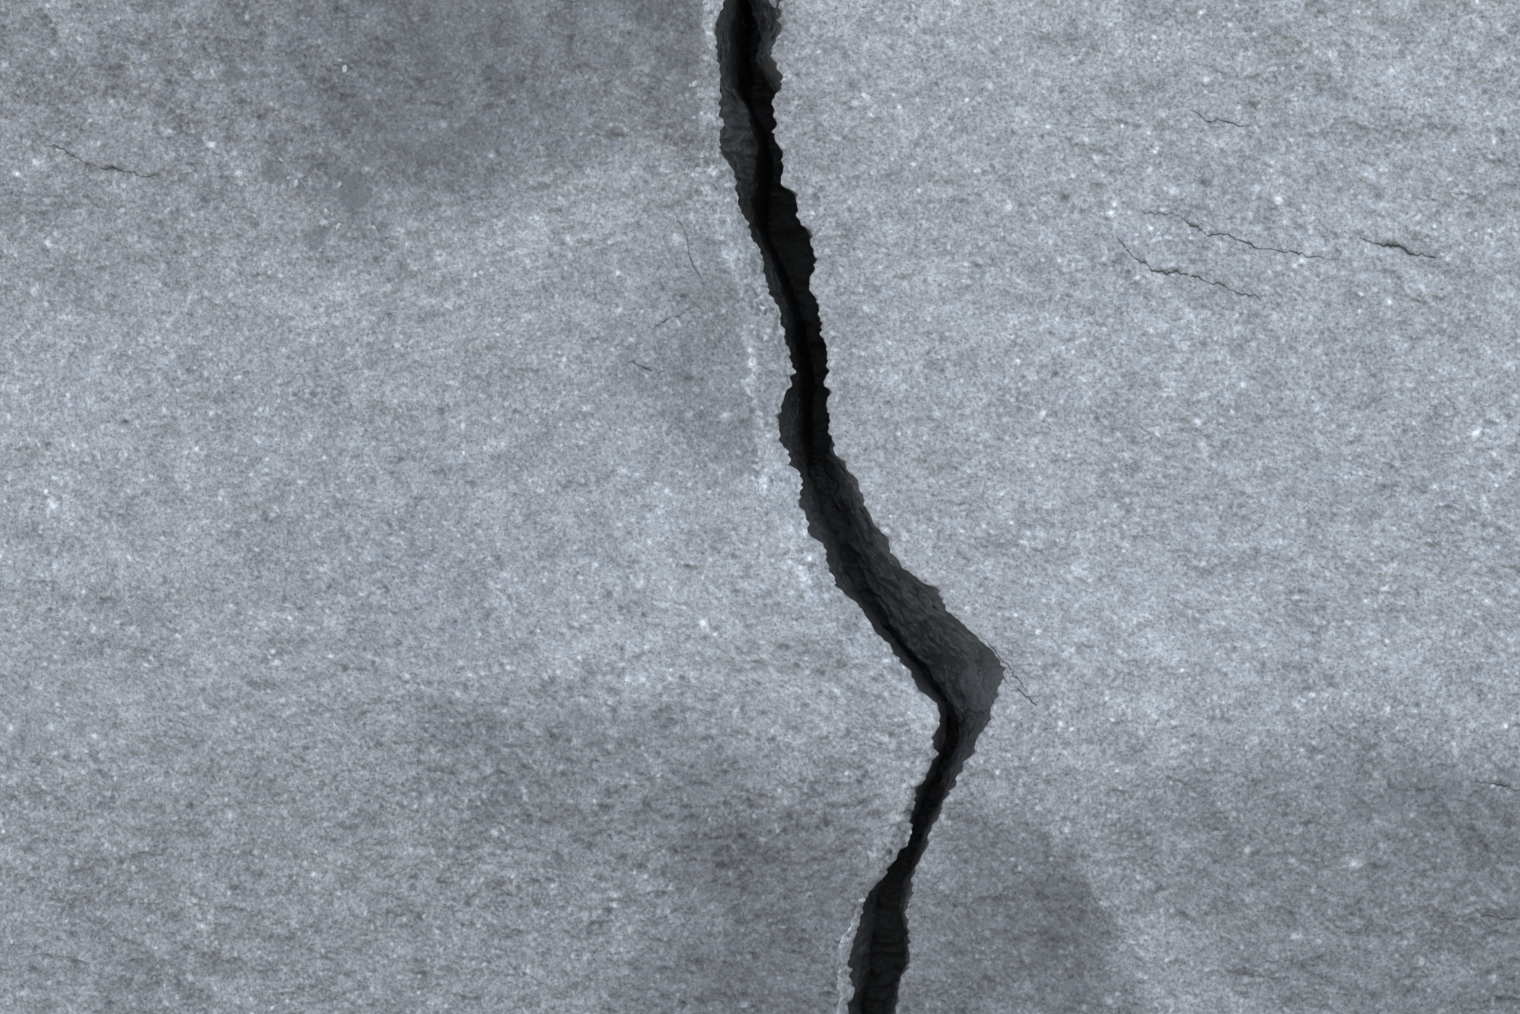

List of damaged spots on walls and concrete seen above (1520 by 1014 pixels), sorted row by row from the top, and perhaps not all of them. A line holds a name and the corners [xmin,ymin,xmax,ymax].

crack [654,0,1037,1014]